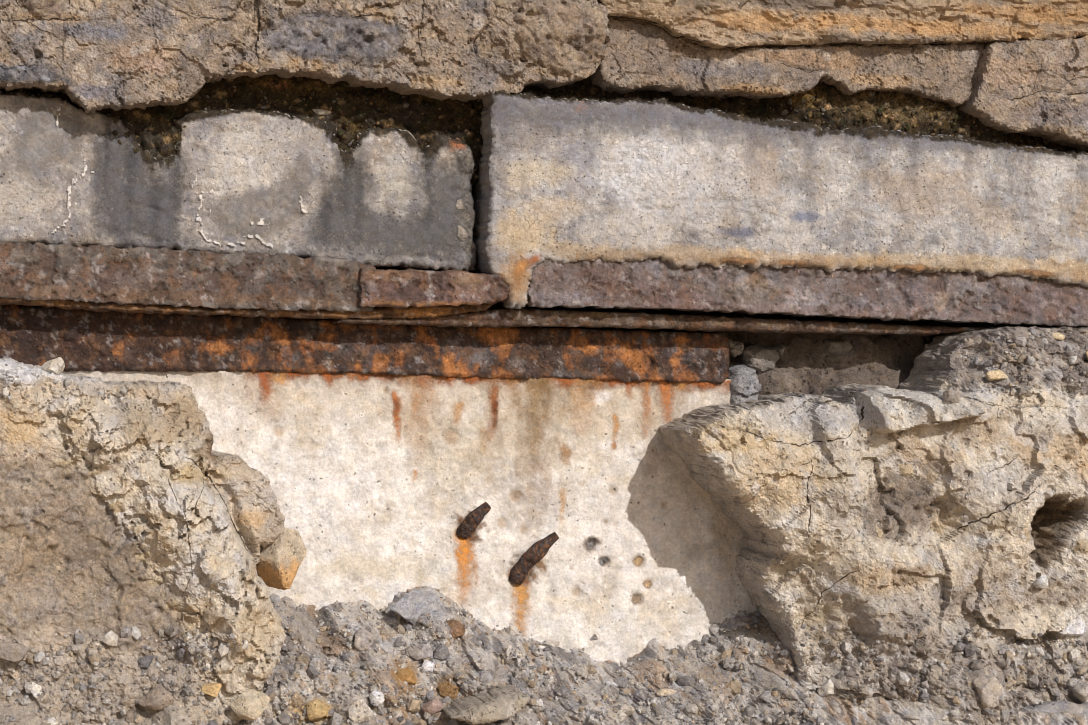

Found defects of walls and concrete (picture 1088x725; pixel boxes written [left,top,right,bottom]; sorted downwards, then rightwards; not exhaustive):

water stain [17,104,465,260]
rust [0,297,492,320]
rust [259,371,731,443]
crack [167,457,248,595]
rust [456,536,477,588]
rust [509,571,529,631]
crack [742,405,865,541]
crack [801,569,861,626]
spalling [659,326,1088,725]
crack [952,485,1039,532]